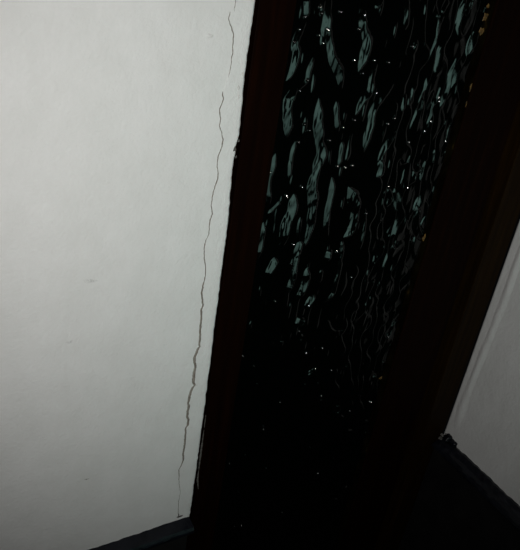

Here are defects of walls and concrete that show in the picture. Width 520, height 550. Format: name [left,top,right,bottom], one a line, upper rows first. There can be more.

crack [178,0,236,514]